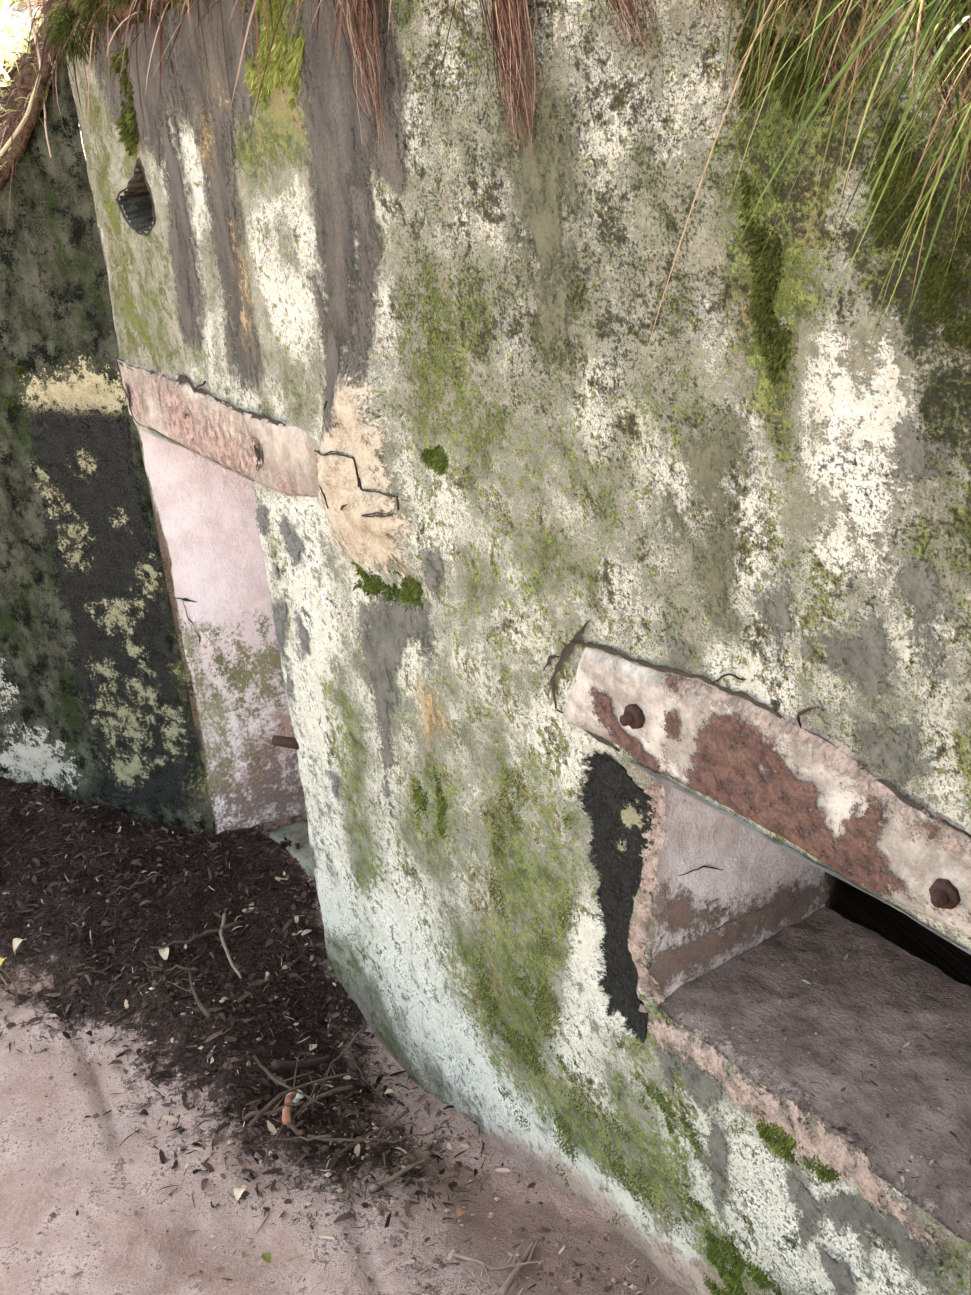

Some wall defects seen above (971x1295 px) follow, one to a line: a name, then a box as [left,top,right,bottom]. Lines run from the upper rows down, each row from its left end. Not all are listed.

damp [91,0,263,392]
damp [286,0,406,441]
rust [665,674,682,693]
rust [589,687,906,902]
rust [922,820,943,845]